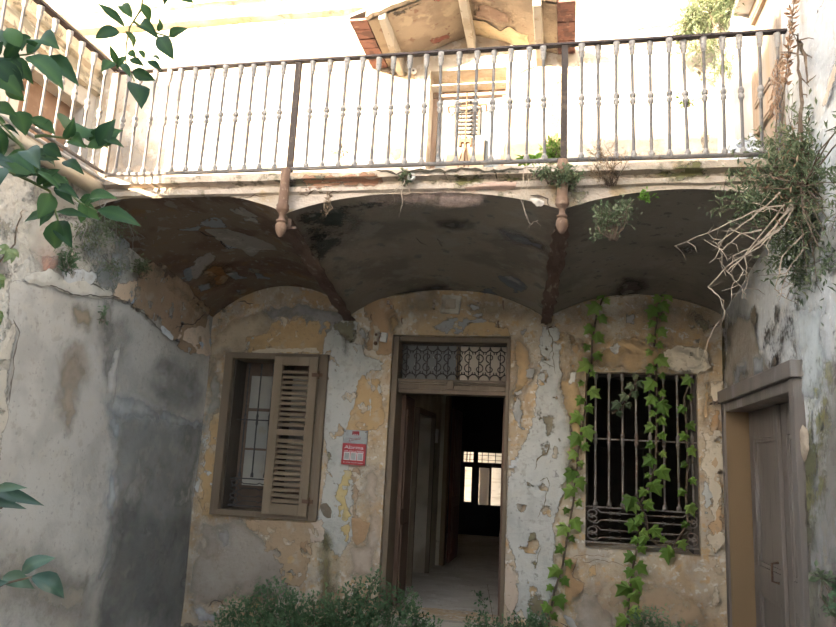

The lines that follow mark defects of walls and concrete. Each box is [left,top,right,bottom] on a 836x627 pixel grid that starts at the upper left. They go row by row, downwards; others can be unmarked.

peeling [180,217,286,280]
peeling [131,252,216,356]
peeling [252,317,320,353]
peeling [663,339,711,374]
spalling [338,467,370,545]
peeling [701,381,725,553]
damp [805,355,836,567]
damp [814,596,836,627]